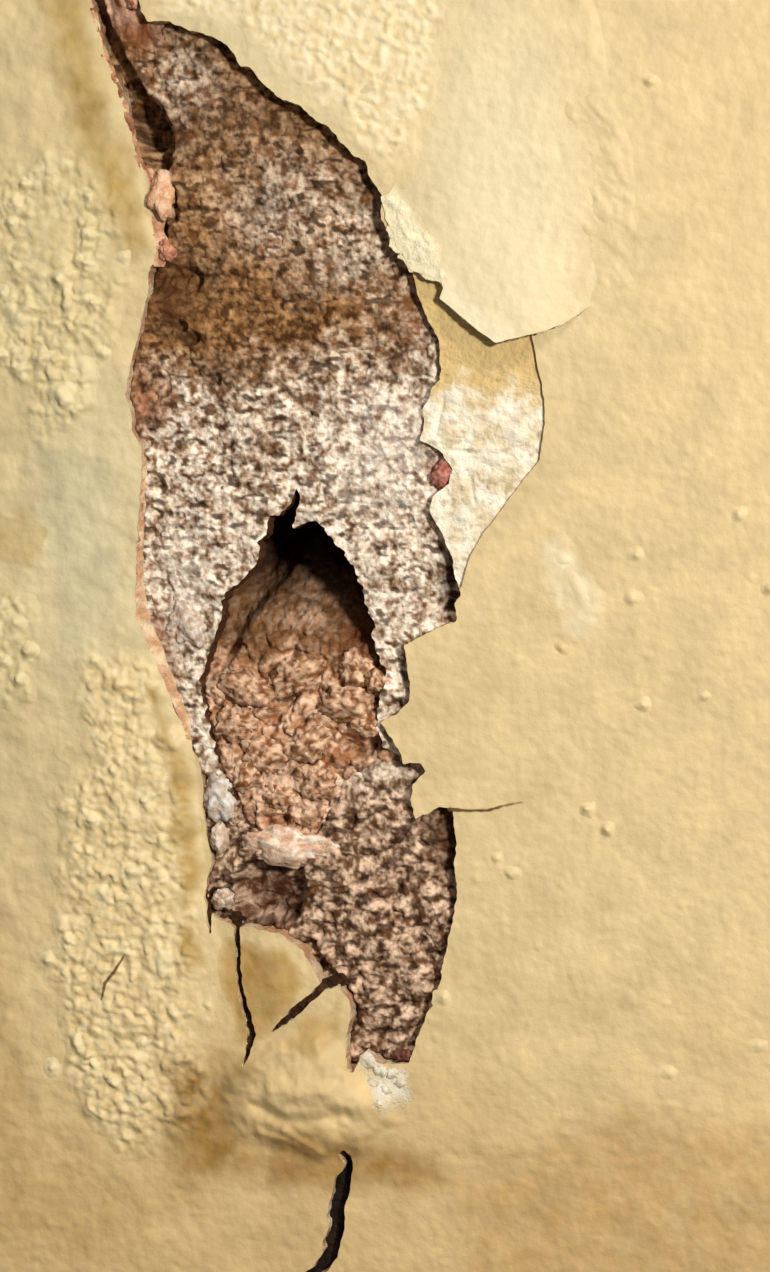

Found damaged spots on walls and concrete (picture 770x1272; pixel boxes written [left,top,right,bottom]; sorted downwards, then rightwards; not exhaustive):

flaking render [31,0,609,1162]
crack [448,803,515,812]
crack [206,888,347,1060]
leakage [0,678,770,1272]
crack [306,1151,353,1272]